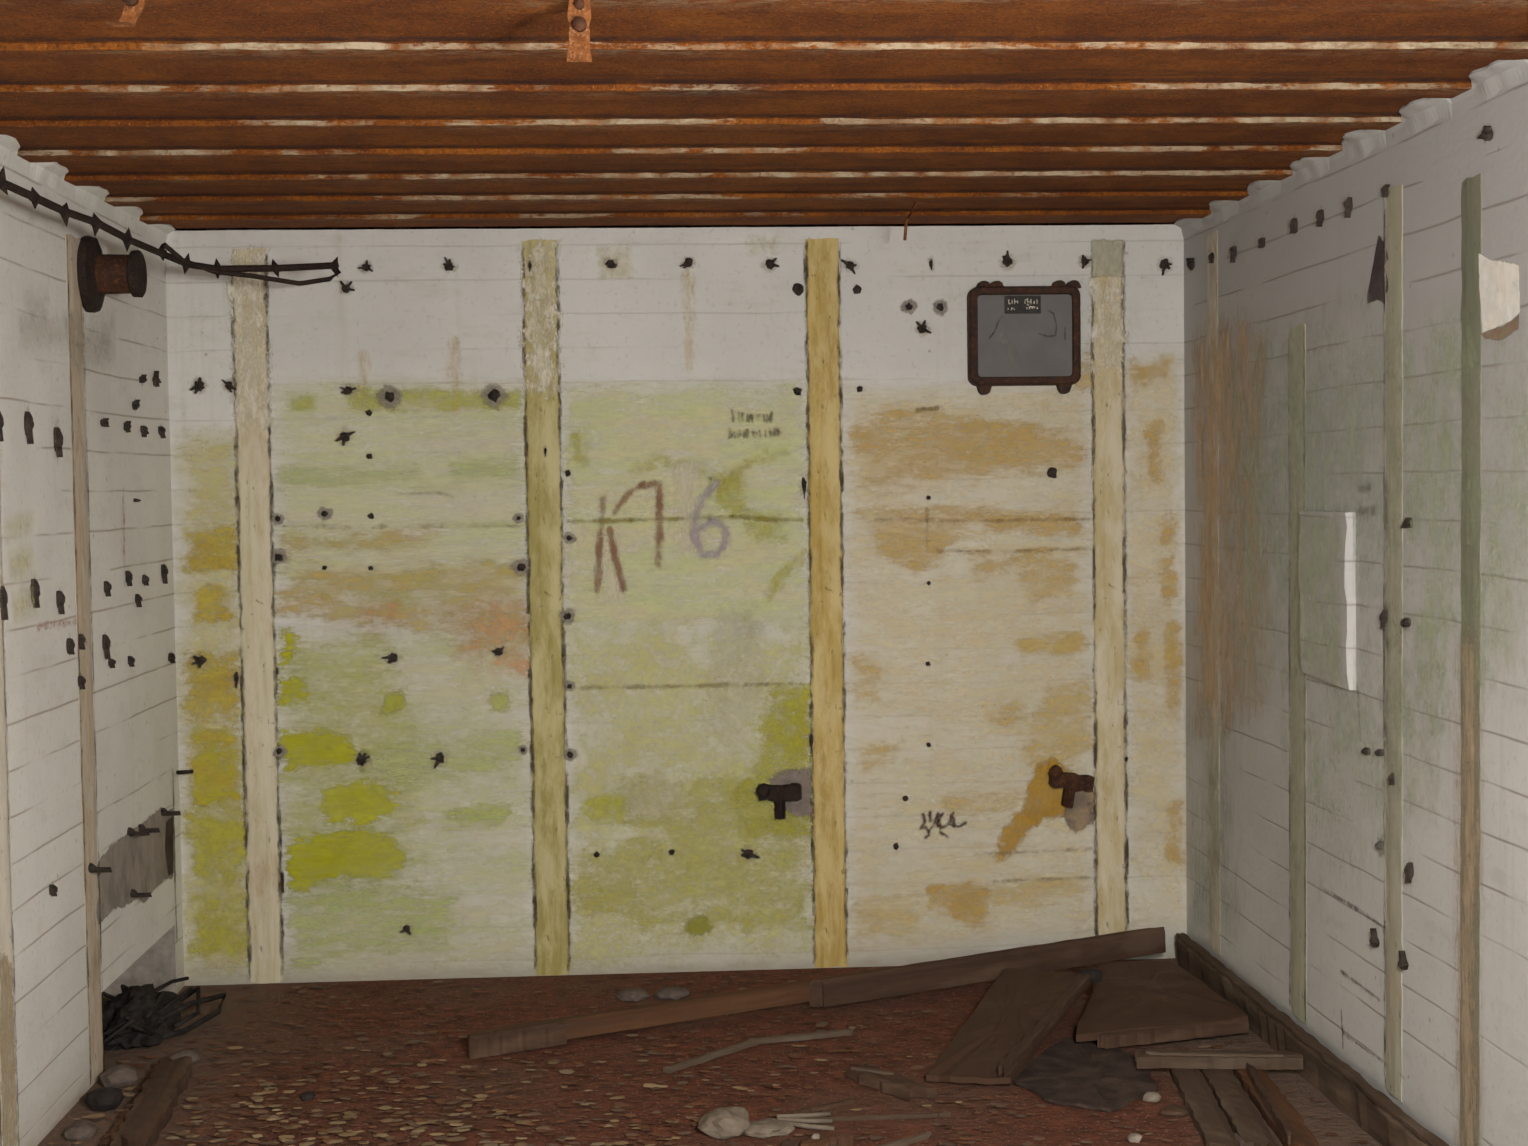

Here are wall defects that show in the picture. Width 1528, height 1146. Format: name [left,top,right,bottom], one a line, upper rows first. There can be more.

spalling [1479,254,1520,333]
leakage [852,410,1082,472]
leakage [277,561,525,635]
leakage [1017,632,1085,654]
corrosion [997,758,1067,862]